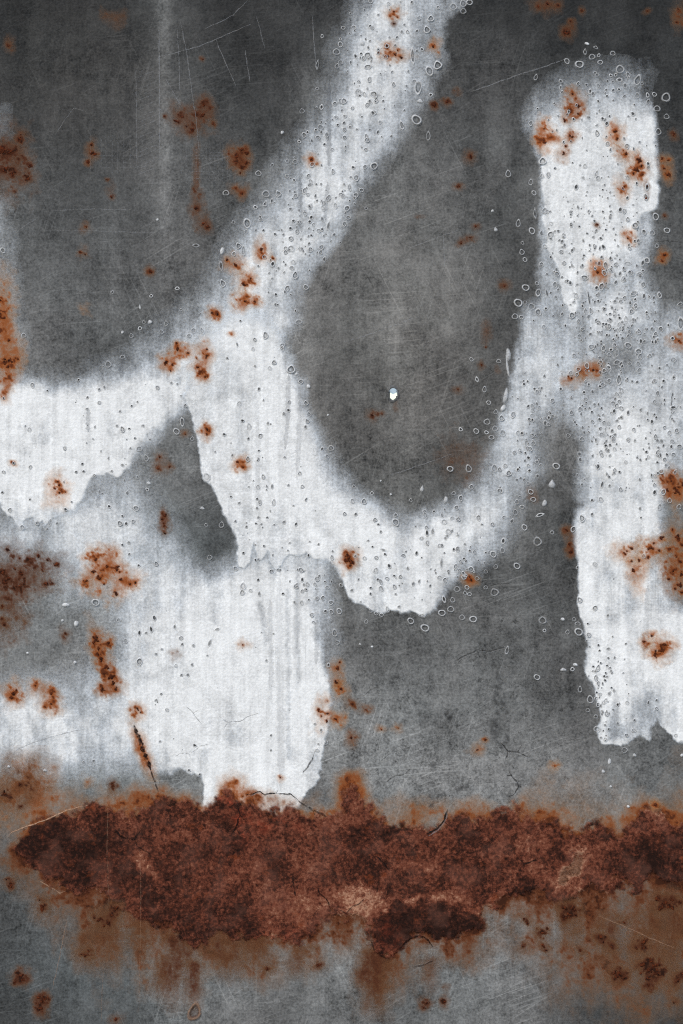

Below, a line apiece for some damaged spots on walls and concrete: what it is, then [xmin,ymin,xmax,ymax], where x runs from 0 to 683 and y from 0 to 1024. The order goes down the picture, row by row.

rust [533,89,586,155]
rust [0,132,33,193]
rust [608,122,649,199]
rust [160,341,213,380]
rust [659,470,683,503]
rust [79,548,139,597]
rust [619,528,683,595]
rust [89,630,122,696]
rust [642,632,673,658]
rust [0,705,683,1016]